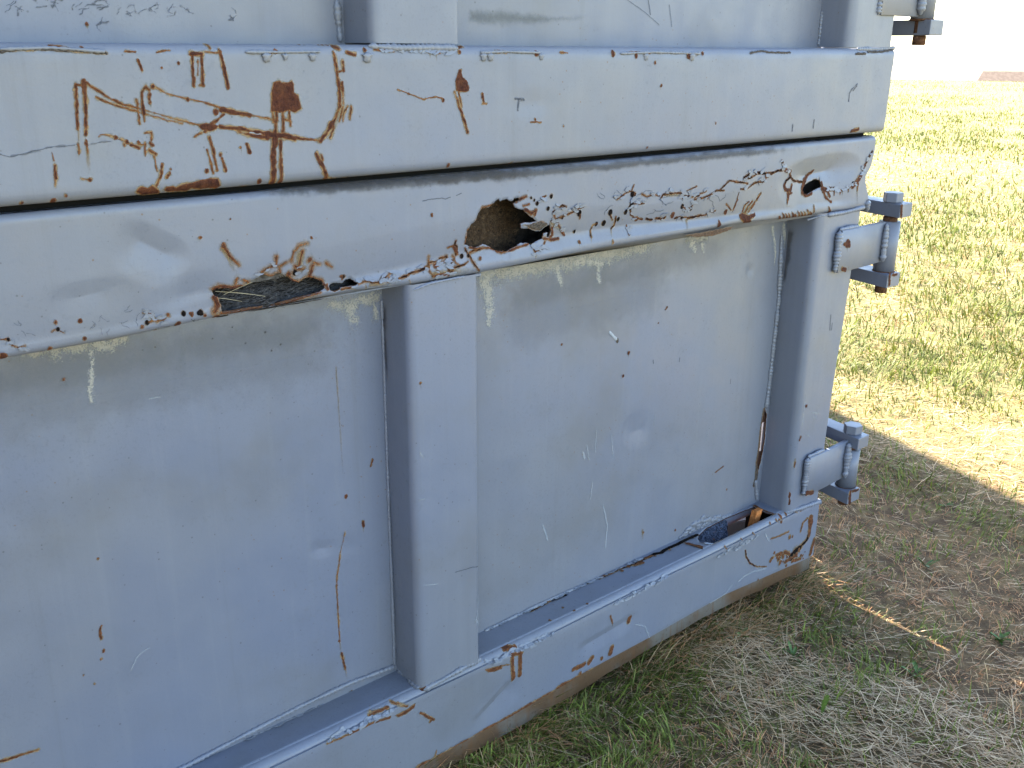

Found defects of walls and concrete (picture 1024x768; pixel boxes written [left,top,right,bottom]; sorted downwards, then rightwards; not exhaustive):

corrosion [72,43,395,195]
corrosion [687,192,762,237]
corrosion [777,183,832,220]
corrosion [769,490,815,567]
corrosion [416,644,614,768]